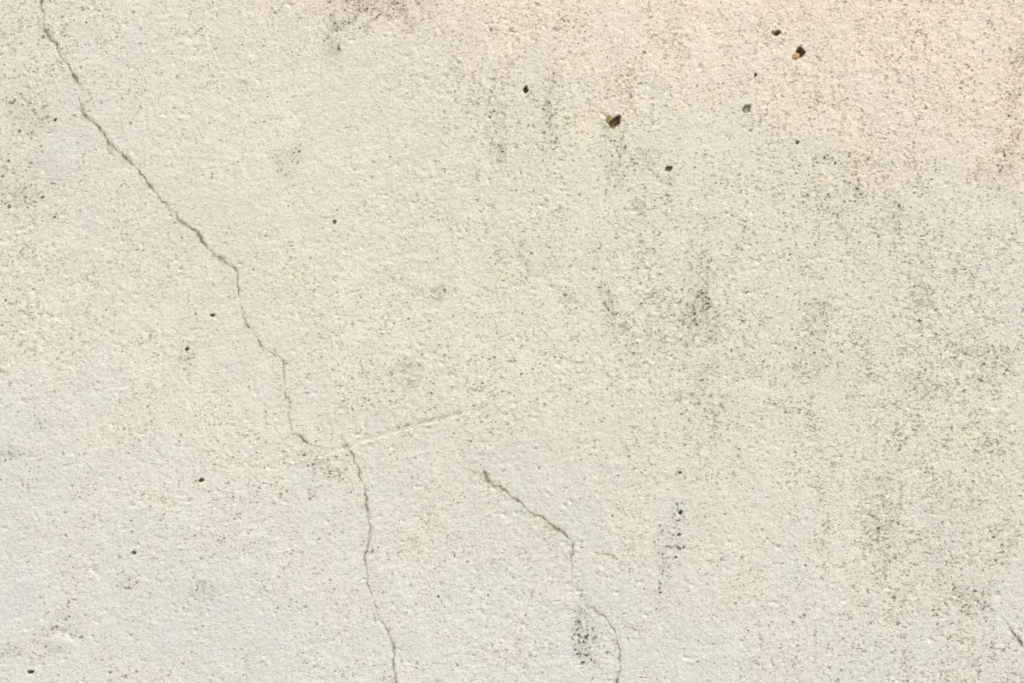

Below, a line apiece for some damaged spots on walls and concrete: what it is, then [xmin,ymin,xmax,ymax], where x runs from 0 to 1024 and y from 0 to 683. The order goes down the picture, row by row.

crack [41,0,79,83]
crack [83,113,286,397]
crack [483,471,574,555]